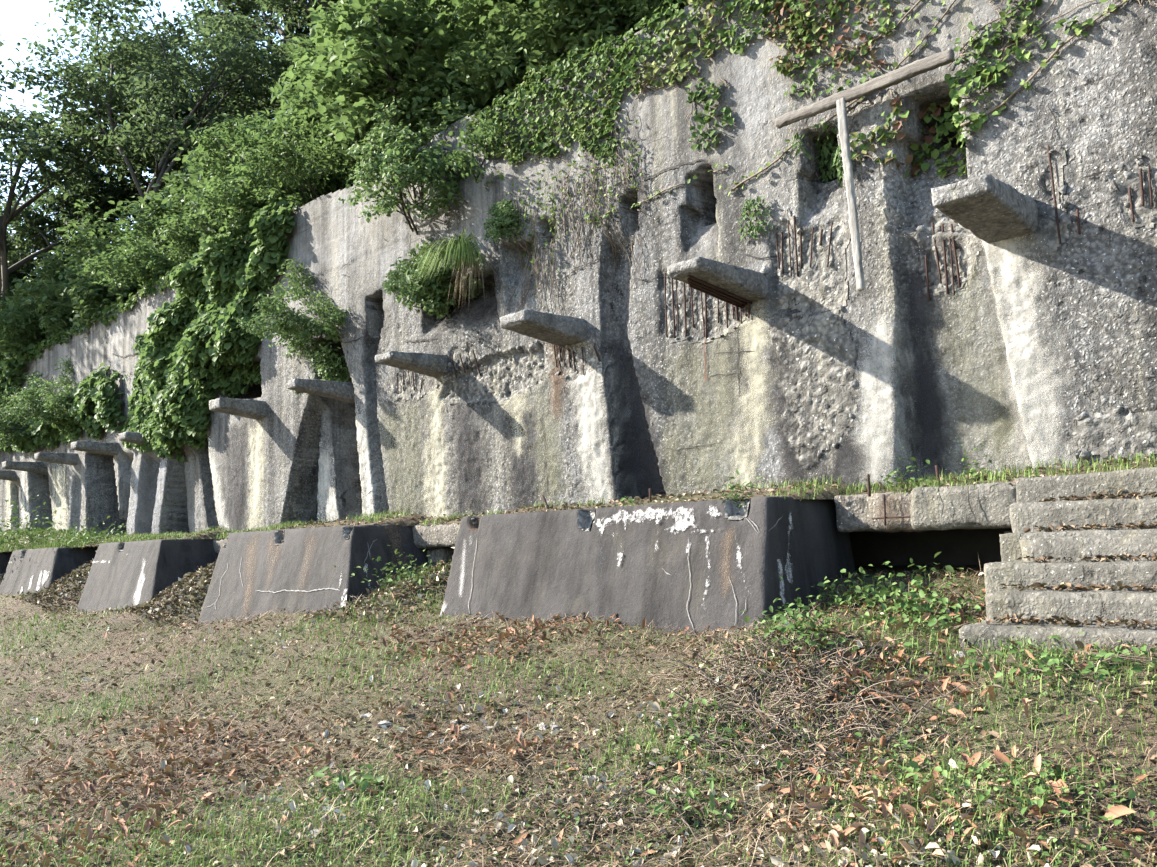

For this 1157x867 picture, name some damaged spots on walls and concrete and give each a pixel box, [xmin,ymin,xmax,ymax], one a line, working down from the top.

water stain [831,270,946,484]
water stain [570,345,720,567]
spalling [577,510,596,531]
spalling [724,500,751,520]
crack [207,557,340,610]